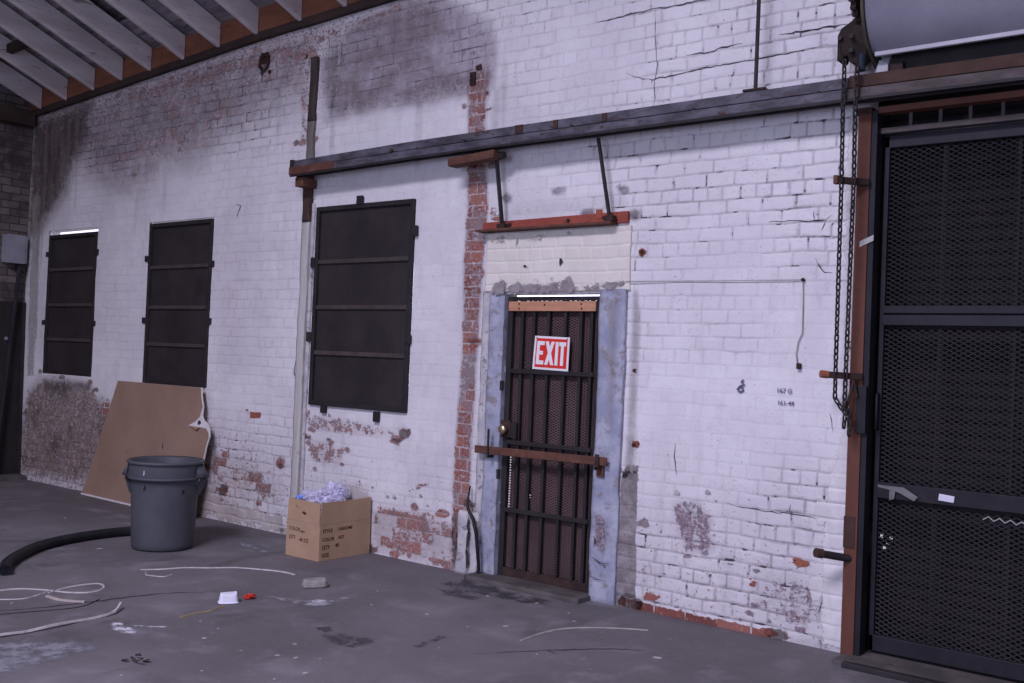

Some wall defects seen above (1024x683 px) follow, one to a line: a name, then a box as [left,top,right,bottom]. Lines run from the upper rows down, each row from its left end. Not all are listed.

water stain [324,0,493,117]
crack [600,0,847,100]
flaking render [369,162,624,570]
flaking render [20,369,110,481]
peeling [305,410,410,471]
peeling [674,490,715,558]
flaking render [619,569,817,640]